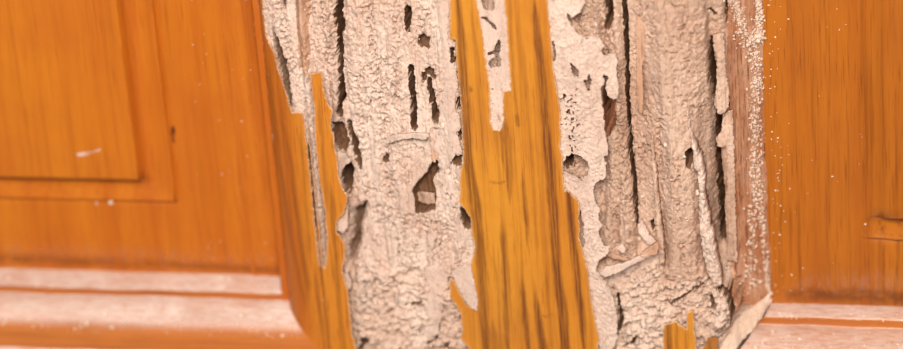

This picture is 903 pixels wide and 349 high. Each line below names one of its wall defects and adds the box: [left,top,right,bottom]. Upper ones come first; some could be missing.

peeling [337,150,351,178]
peeling [417,190,436,205]
peeling [337,198,352,233]
peeling [637,219,656,245]